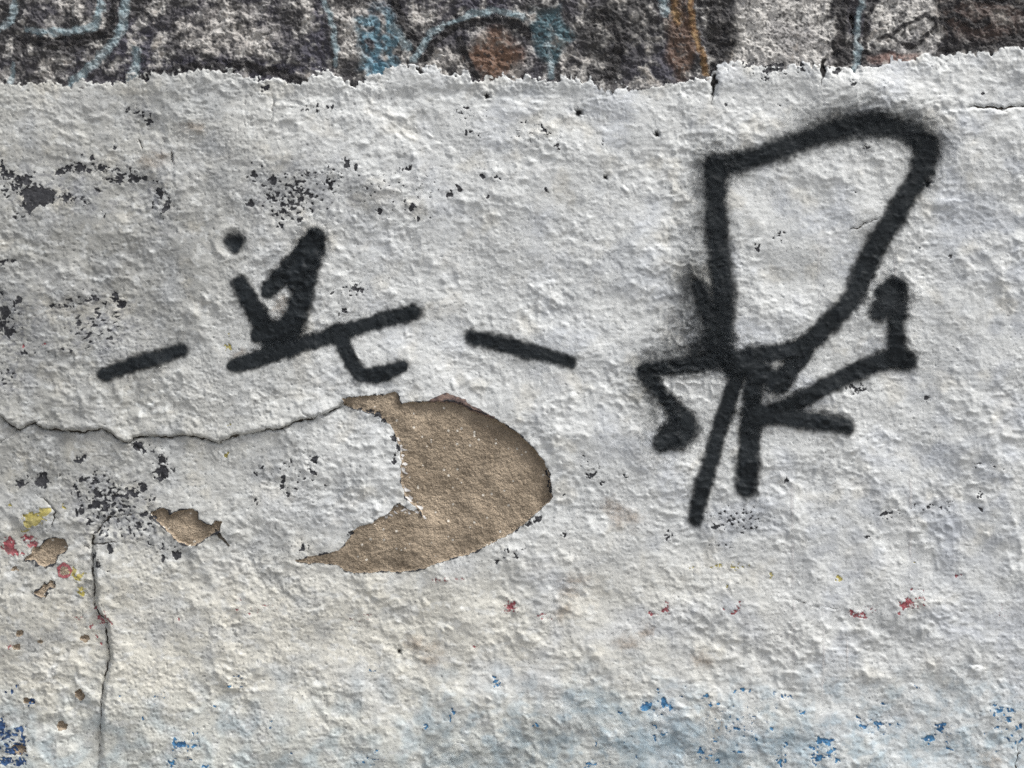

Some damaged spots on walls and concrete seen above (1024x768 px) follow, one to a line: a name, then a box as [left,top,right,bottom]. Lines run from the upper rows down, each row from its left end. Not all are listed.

peeling [742,61,805,81]
spalling [0,441,230,598]
crack [1,403,346,449]
peeling [253,456,327,497]
spalling [296,392,566,582]
crack [88,513,138,751]